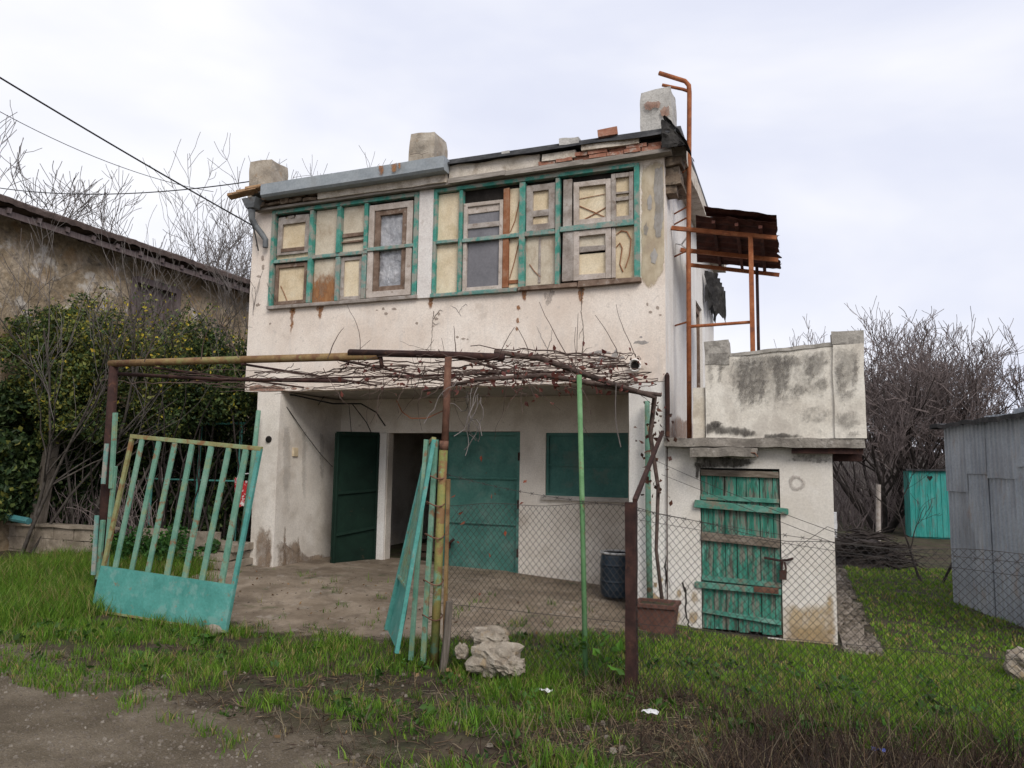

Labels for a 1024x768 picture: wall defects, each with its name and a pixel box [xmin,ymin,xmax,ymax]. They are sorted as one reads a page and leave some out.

spalling [538,141,664,286]
water stain [707,421,797,438]
water stain [256,530,322,567]